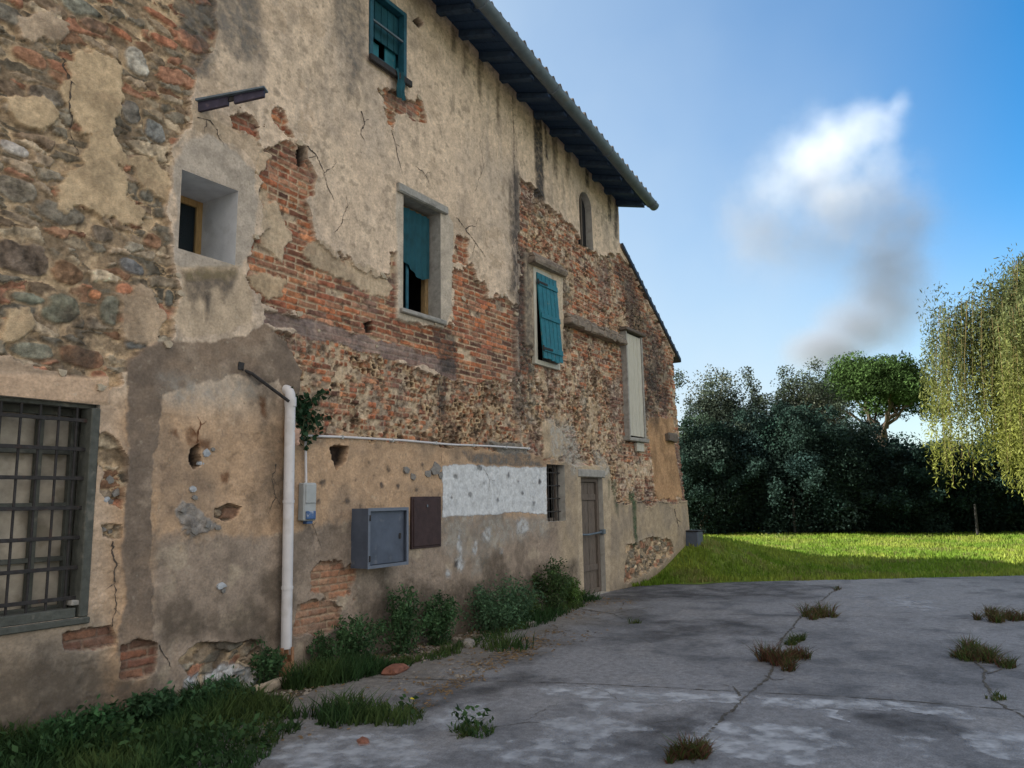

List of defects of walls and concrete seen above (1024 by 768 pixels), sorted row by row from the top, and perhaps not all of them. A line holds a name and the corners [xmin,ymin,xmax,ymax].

flaking render [377,87,427,130]
crack [303,146,348,232]
flaking render [229,106,685,508]
spalling [188,444,215,468]
crack [108,541,120,630]
flaking render [292,559,357,637]
flaking render [62,625,158,679]